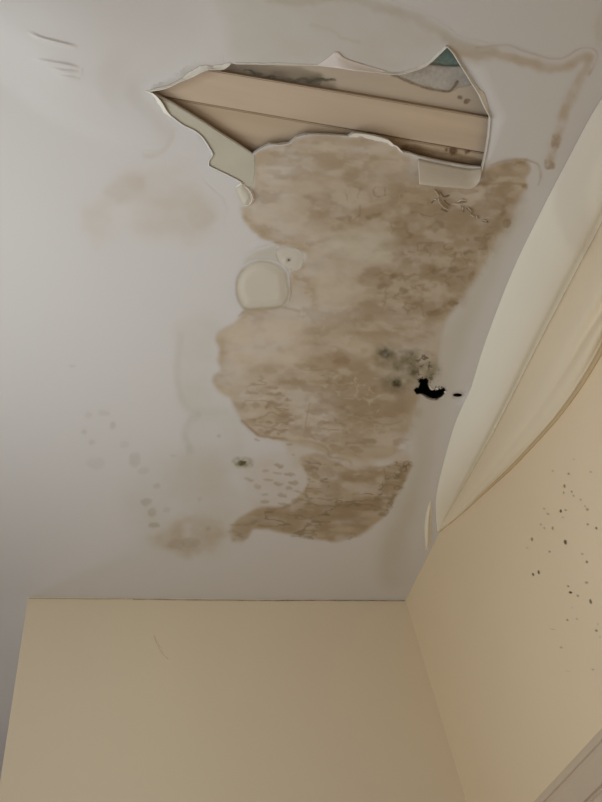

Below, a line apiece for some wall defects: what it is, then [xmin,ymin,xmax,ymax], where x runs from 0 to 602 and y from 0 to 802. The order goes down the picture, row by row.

flaking render [159,98,255,206]
damp [74,0,602,596]